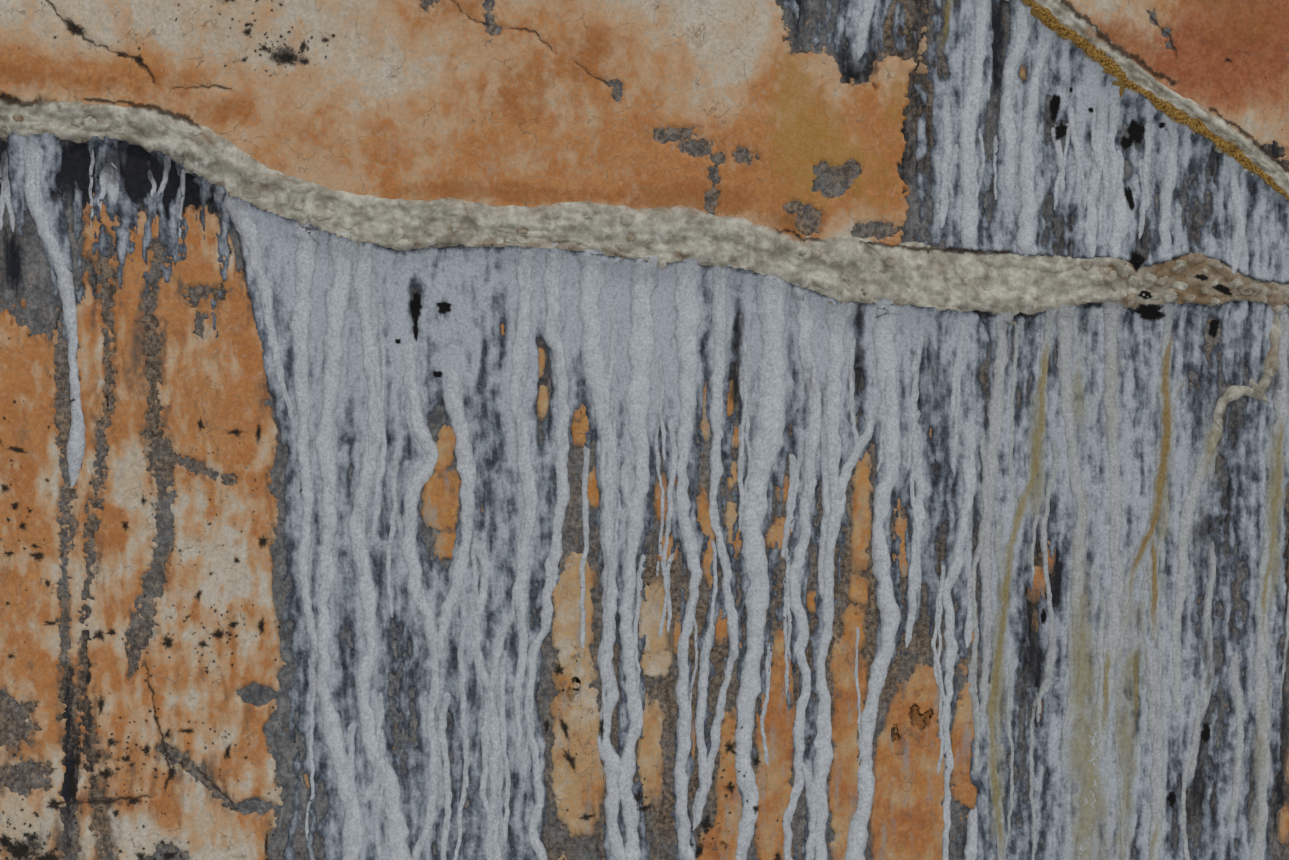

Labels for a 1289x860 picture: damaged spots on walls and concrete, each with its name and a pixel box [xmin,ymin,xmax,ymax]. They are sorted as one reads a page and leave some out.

crack [0,94,40,107]
crack [46,0,231,128]
crack [453,0,609,85]
peeling [653,126,760,215]
peeling [775,0,967,254]
peeling [978,0,1011,224]
peeling [1043,87,1073,151]
peeling [1120,119,1174,271]
rust [1021,0,1289,201]
peeling [0,140,249,860]
leakage [170,591,254,683]
leakage [558,709,577,770]